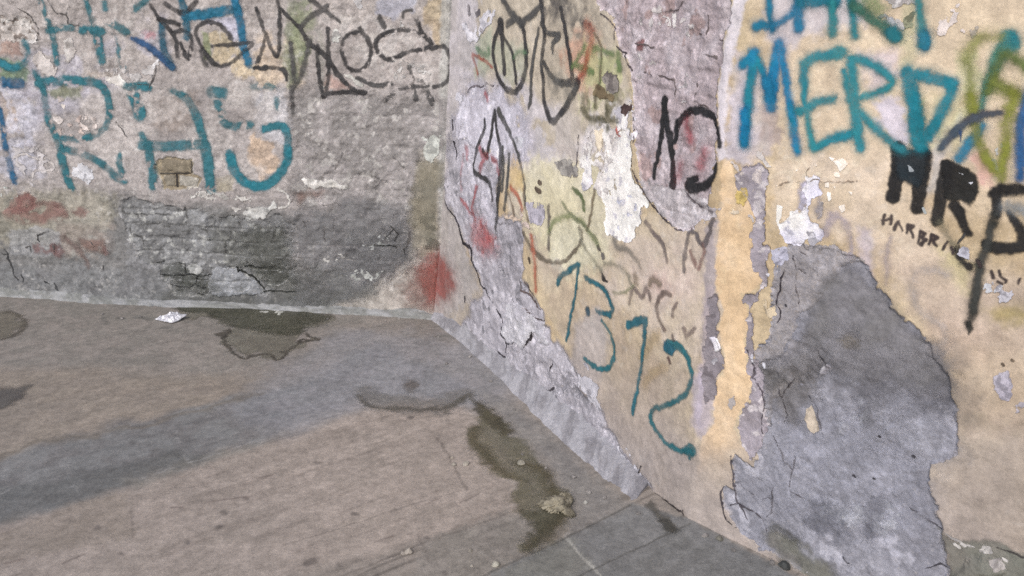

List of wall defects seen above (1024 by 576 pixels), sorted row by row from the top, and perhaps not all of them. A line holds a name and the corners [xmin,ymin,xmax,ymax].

peeling [462,4,495,42]
crack [2,231,58,291]
crack [236,265,294,292]
flaking render [118,74,652,488]
flaking render [554,0,959,576]
peeling [957,246,970,259]
peeling [983,282,1014,303]
leakage [177,307,335,360]
leakage [360,393,564,548]